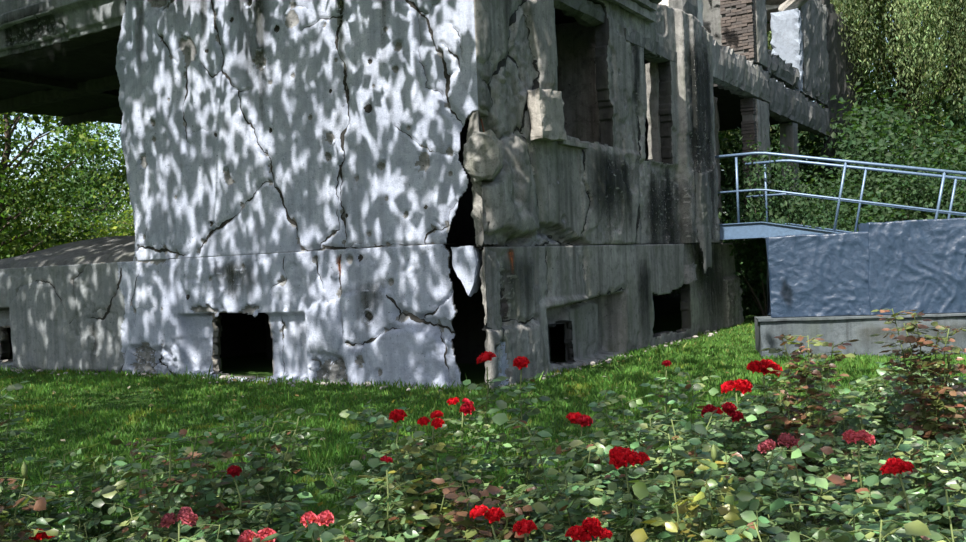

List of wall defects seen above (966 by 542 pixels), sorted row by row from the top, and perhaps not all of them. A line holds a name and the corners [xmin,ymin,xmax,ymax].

crack [16,0,459,333]
crack [405,0,625,306]
damp [595,155,630,209]
damp [650,170,682,244]
damp [689,50,713,182]
spalling [128,342,159,374]
spalling [312,355,365,384]
crack [345,294,457,388]
crack [482,317,535,338]